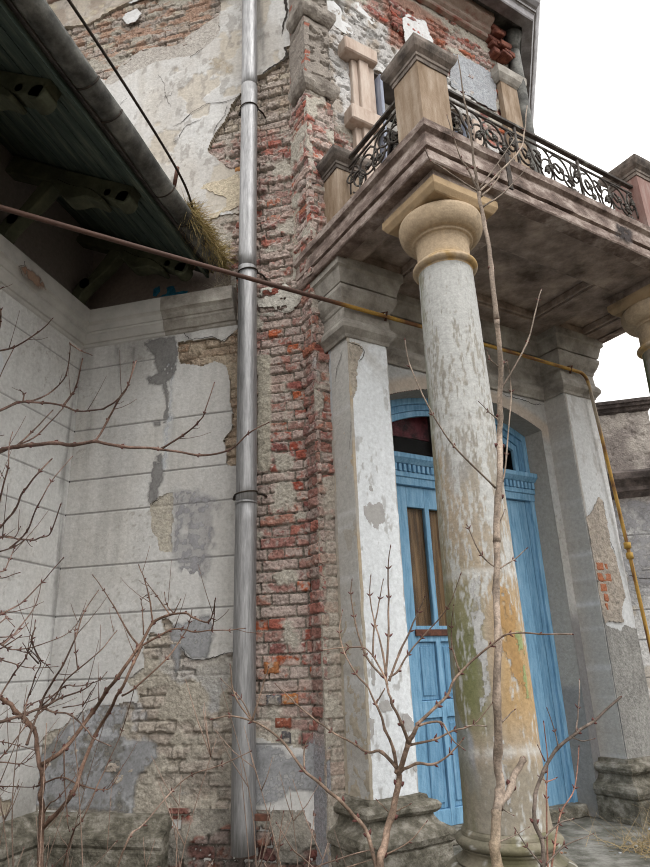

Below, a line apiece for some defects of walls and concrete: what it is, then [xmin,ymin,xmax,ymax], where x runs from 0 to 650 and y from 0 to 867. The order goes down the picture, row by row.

flaking render [67,0,221,84]
flaking render [485,23,515,65]
crack [174,96,238,142]
flaking render [209,99,241,172]
flaking render [208,205,239,316]
leakage [145,337,178,433]
flaking render [178,329,238,466]
flaking render [256,48,315,749]
leakage [148,454,166,502]
leakage [174,491,213,576]
flaking render [586,497,626,623]